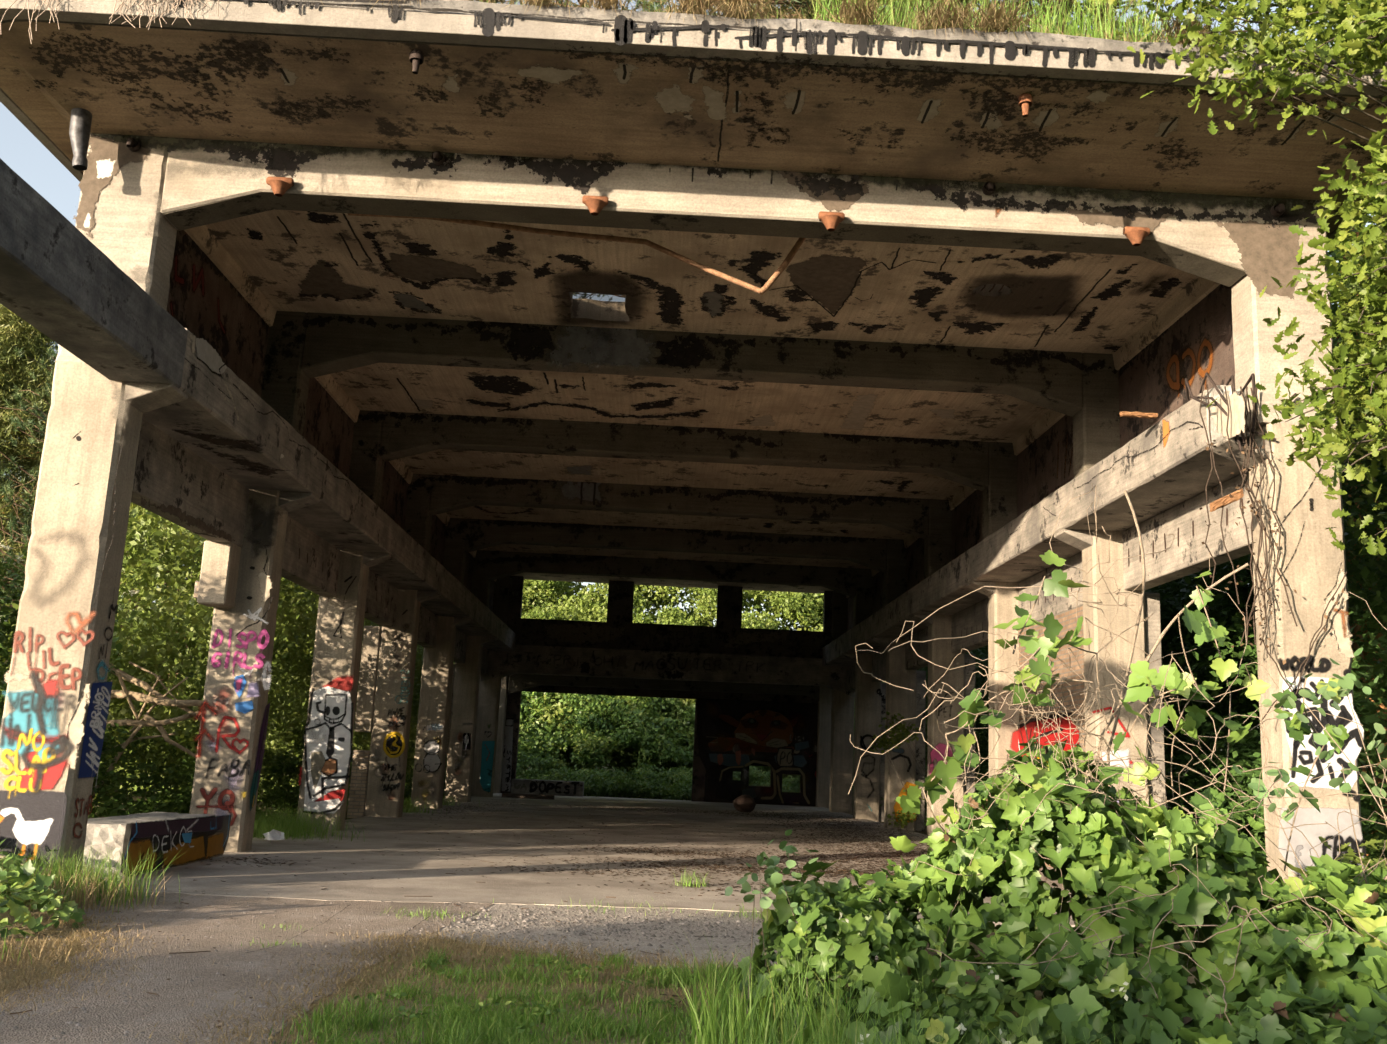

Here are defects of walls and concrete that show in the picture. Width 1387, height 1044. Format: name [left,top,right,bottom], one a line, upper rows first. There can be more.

damp [474,8,522,37]
damp [602,15,677,47]
damp [90,133,624,174]
damp [645,163,763,175]
damp [784,171,1313,216]
peeling [655,284,737,326]
peeling [705,250,1196,377]